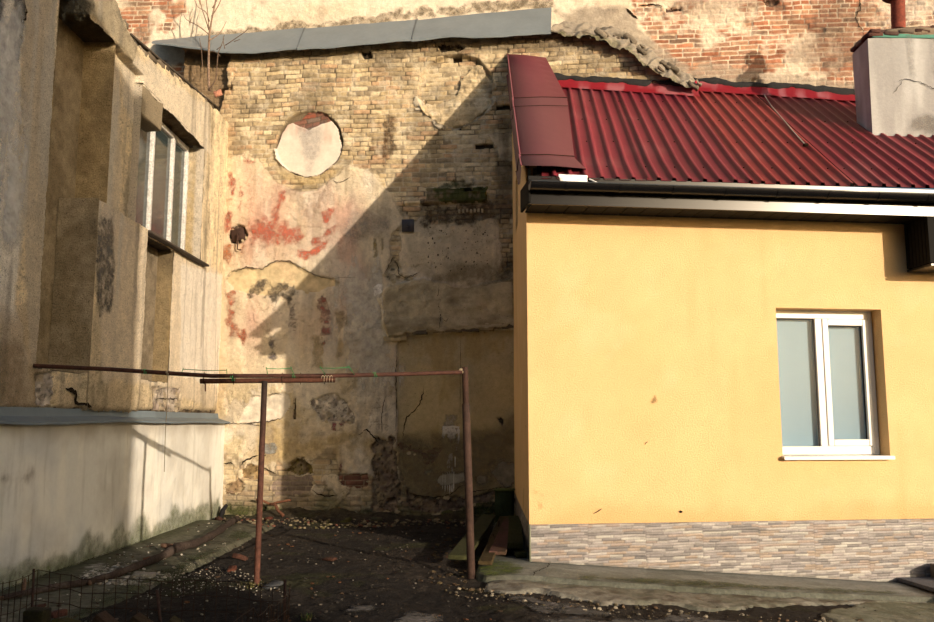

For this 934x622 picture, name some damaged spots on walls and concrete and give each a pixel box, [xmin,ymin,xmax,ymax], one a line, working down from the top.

flaking render [226,260,340,296]
spalling [382,258,419,283]
flaking render [237,392,291,425]
flaking render [311,394,355,424]
crack [359,352,424,442]
spalling [225,478,246,495]
flaking render [271,456,316,497]
flaking render [338,436,424,514]